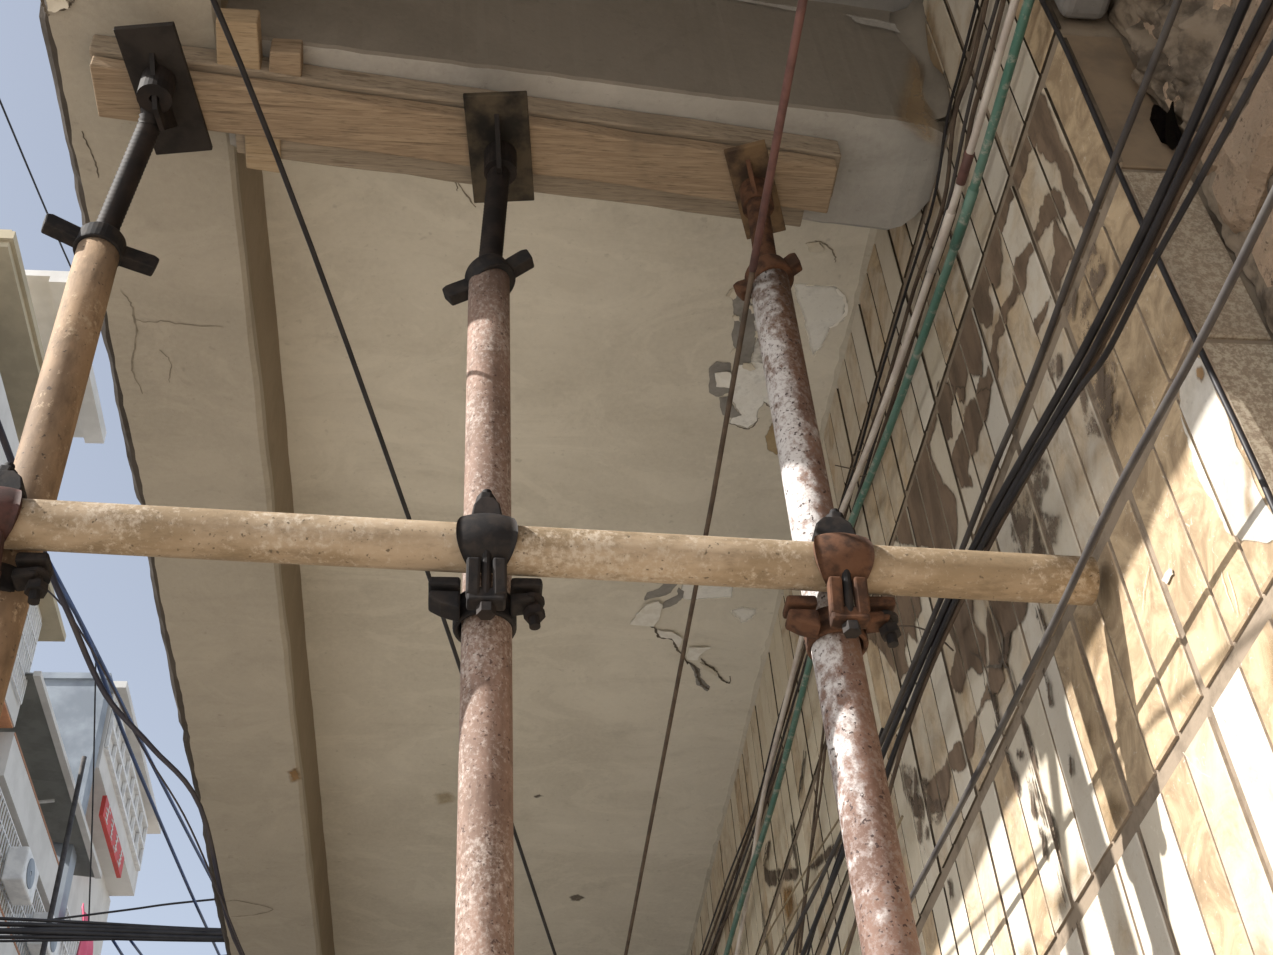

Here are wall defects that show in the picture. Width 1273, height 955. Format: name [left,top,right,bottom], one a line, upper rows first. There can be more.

crack [121,291,220,394]
flaking render [709,288,778,455]
damp [894,94,1119,554]
flaking render [630,583,755,691]
damp [867,594,921,680]
damp [899,599,1047,851]
damp [1004,715,1084,914]
damp [1109,803,1118,827]